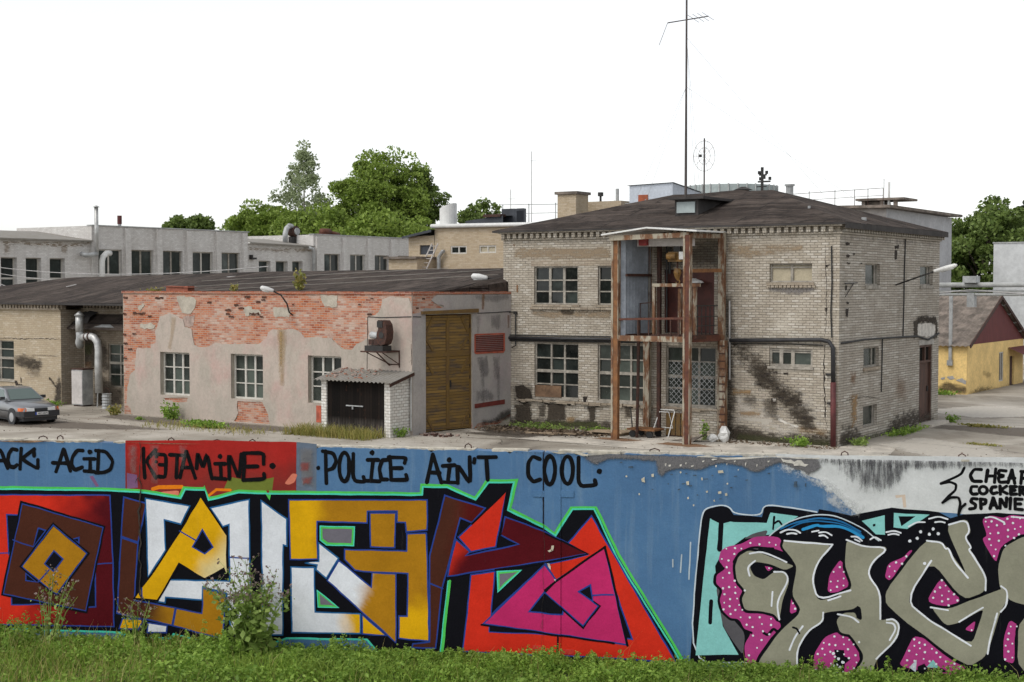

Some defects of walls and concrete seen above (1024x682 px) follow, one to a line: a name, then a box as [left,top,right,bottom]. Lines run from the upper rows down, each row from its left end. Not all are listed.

peeling [123,294,443,414]
peeling [235,401,270,424]
water stain [727,344,1024,446]
spalling [549,451,860,513]
water stain [821,459,1023,488]